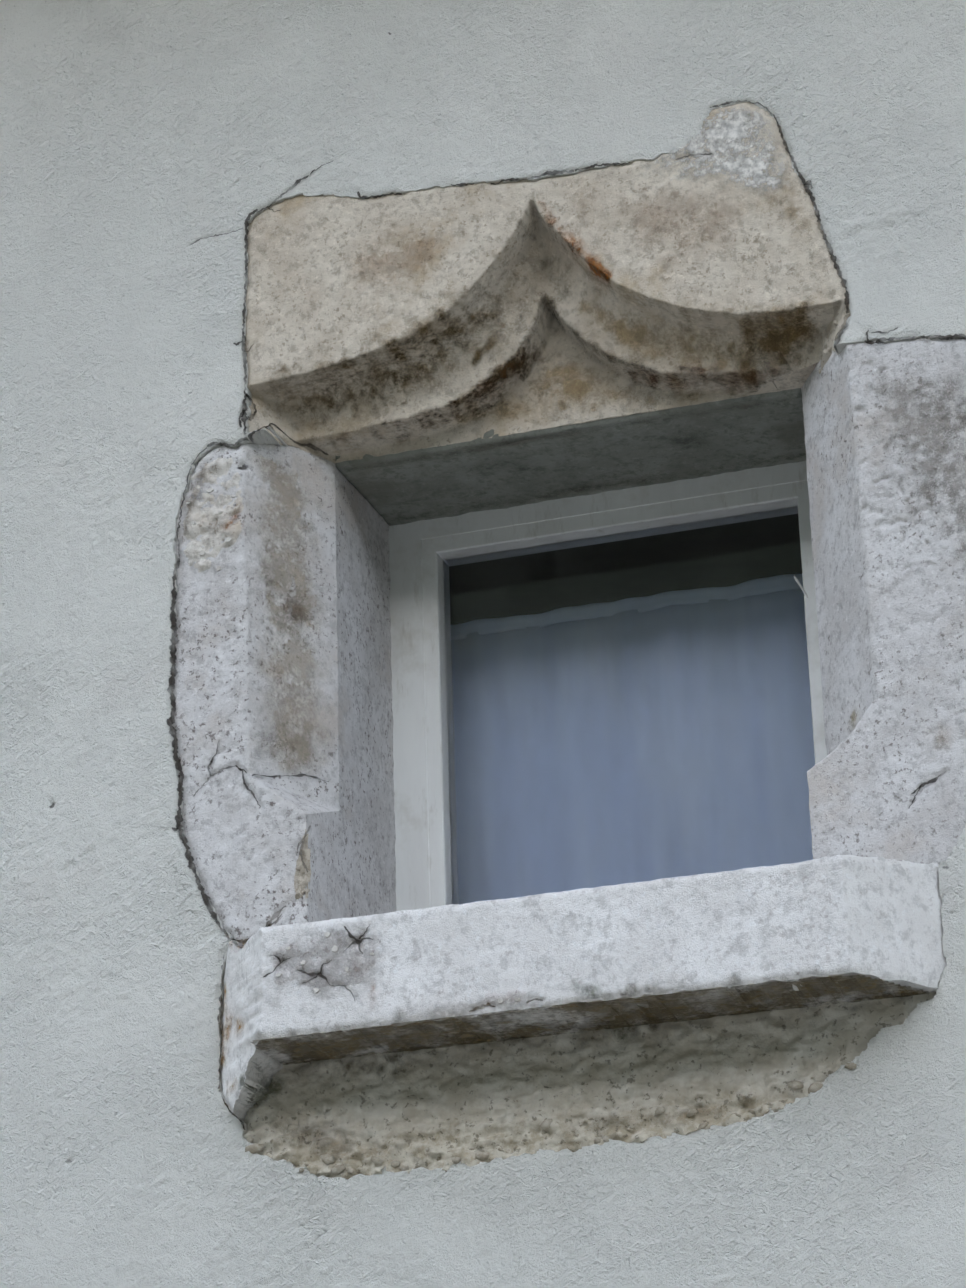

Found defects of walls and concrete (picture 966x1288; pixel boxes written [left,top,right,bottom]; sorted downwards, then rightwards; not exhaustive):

crack [357,191,402,199]
crack [451,163,628,186]
rust [548,216,611,280]
crack [710,101,966,350]
damp [299,309,497,412]
damp [599,312,812,370]
crack [167,162,373,1130]
spalling [243,992,936,1180]